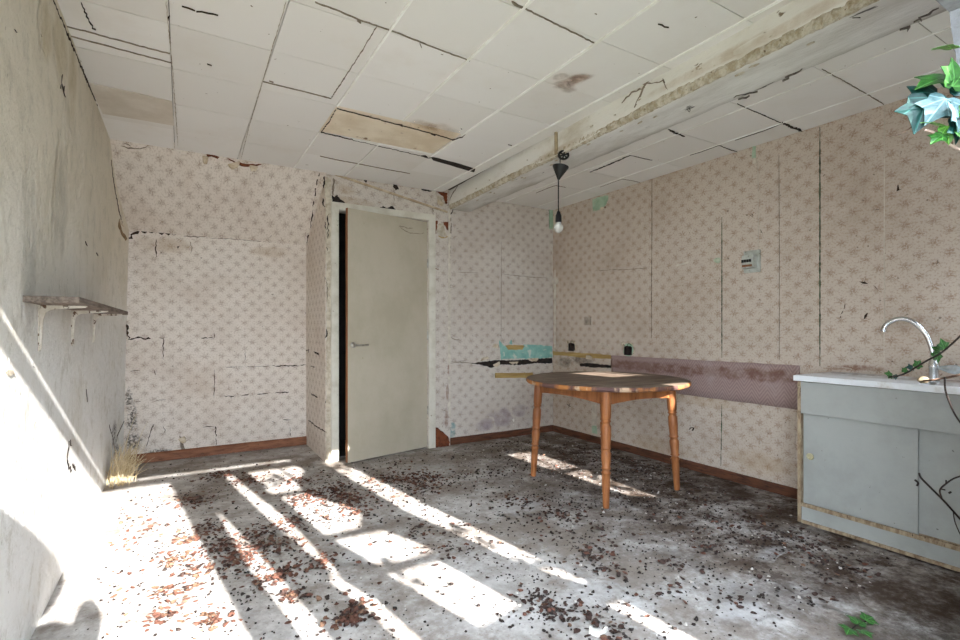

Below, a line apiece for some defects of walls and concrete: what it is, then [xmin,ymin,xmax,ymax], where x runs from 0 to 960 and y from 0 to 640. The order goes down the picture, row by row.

crack [53,0,171,106]
crack [622,78,668,108]
spalling [421,0,879,211]
peeling [202,154,261,171]
crack [111,143,276,257]
crack [126,324,164,375]
peeling [480,340,552,367]
crack [214,369,288,397]